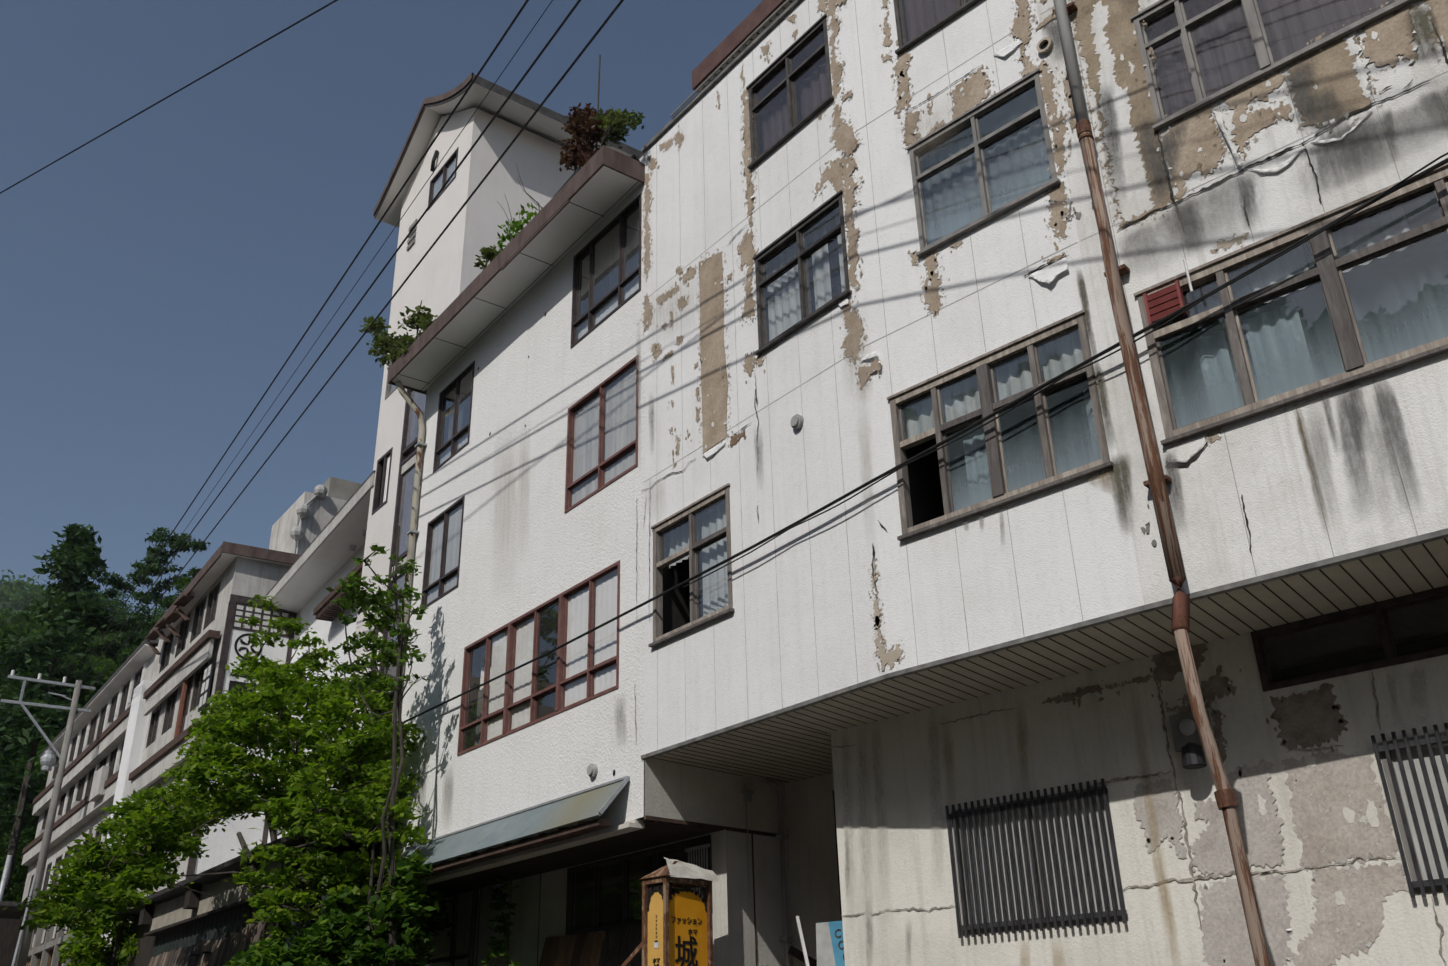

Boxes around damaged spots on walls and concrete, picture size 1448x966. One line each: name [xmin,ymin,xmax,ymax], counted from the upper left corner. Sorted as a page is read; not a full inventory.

peeling [637,59,766,468]
peeling [812,0,882,390]
peeling [908,238,963,319]
peeling [879,0,996,150]
peeling [1009,0,1448,264]
water stain [1297,388,1363,486]
water stain [1378,388,1410,466]
peeling [868,558,905,673]
peeling [1042,643,1410,966]
crack [1086,667,1399,929]
crack [841,905,953,917]
crack [1431,897,1447,966]